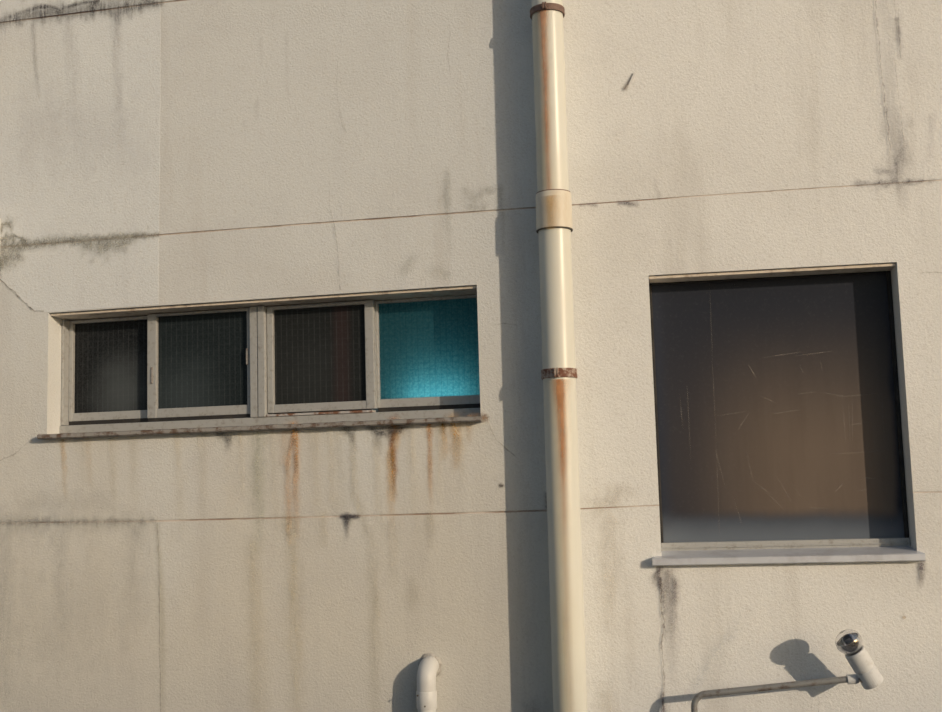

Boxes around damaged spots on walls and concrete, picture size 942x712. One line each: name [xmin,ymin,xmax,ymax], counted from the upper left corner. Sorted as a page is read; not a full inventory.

damp [4,1,162,22]
mould [0,222,155,264]
rust [556,379,564,471]